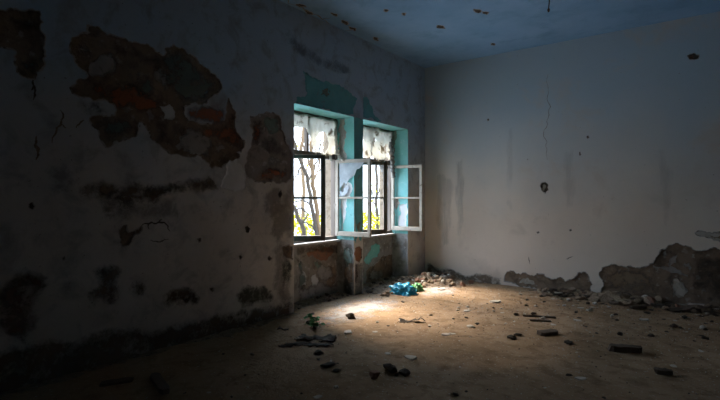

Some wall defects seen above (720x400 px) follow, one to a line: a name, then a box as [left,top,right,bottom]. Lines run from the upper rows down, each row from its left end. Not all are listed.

spalling [0,7,46,80]
spalling [69,24,293,198]
peeling [282,71,392,298]
spalling [504,270,592,291]
spalling [599,230,720,306]